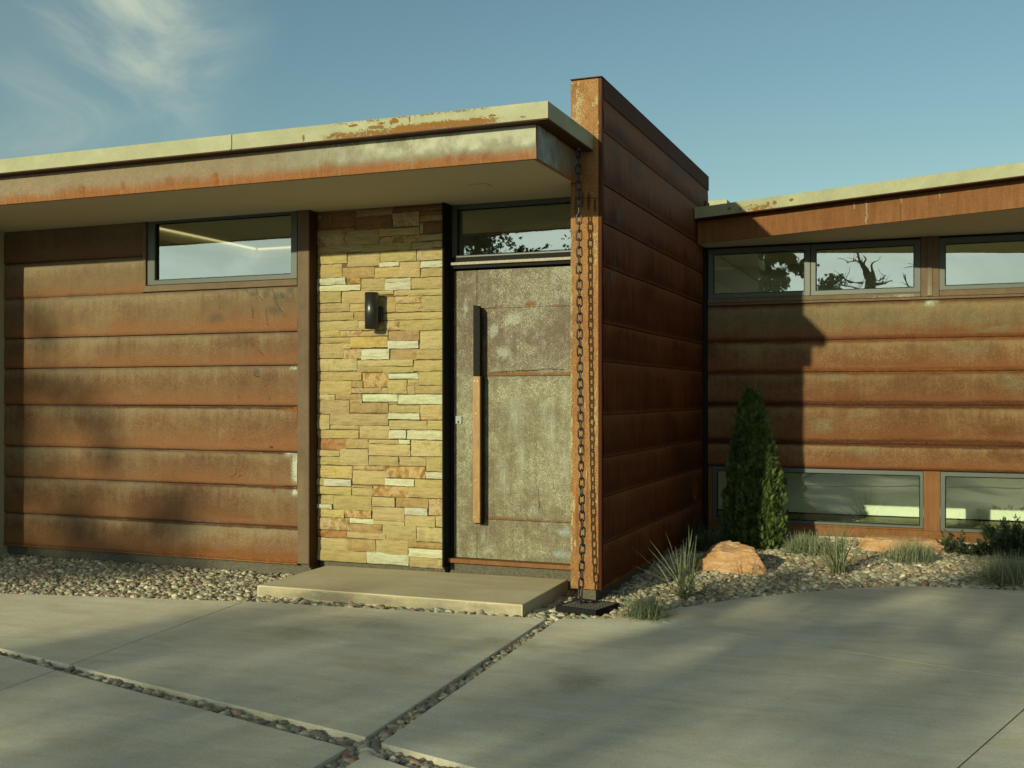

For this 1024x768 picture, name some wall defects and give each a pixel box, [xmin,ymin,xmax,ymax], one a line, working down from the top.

corrosion [571,81,599,135]
corrosion [1,150,486,205]
corrosion [104,404,297,421]
corrosion [774,439,1024,449]
corrosion [89,517,297,530]